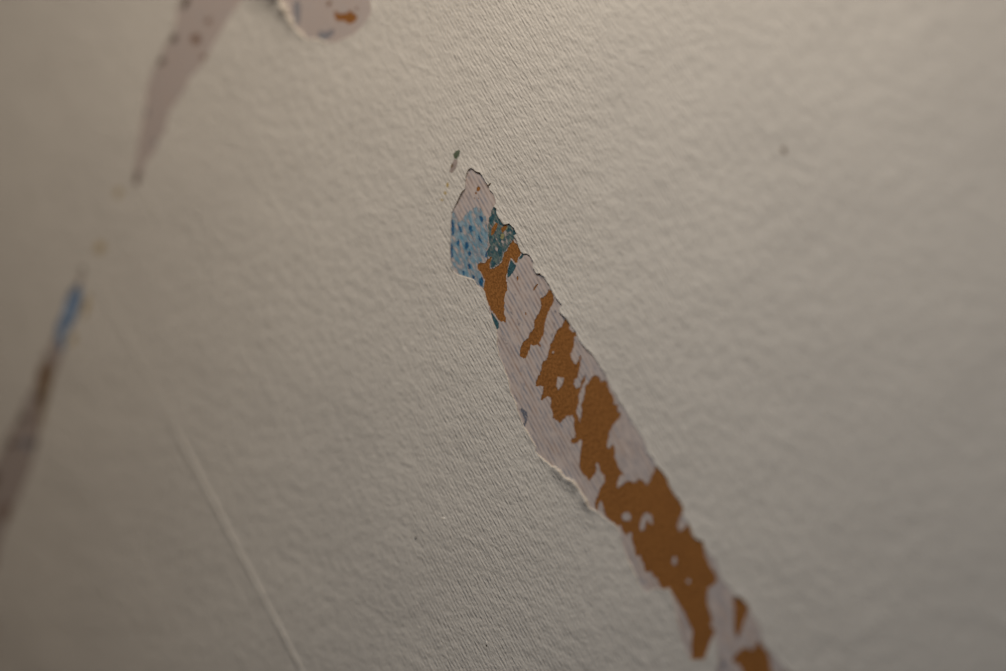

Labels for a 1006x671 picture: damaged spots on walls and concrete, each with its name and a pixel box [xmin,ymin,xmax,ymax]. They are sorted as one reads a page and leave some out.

peeling [622,512,653,530]